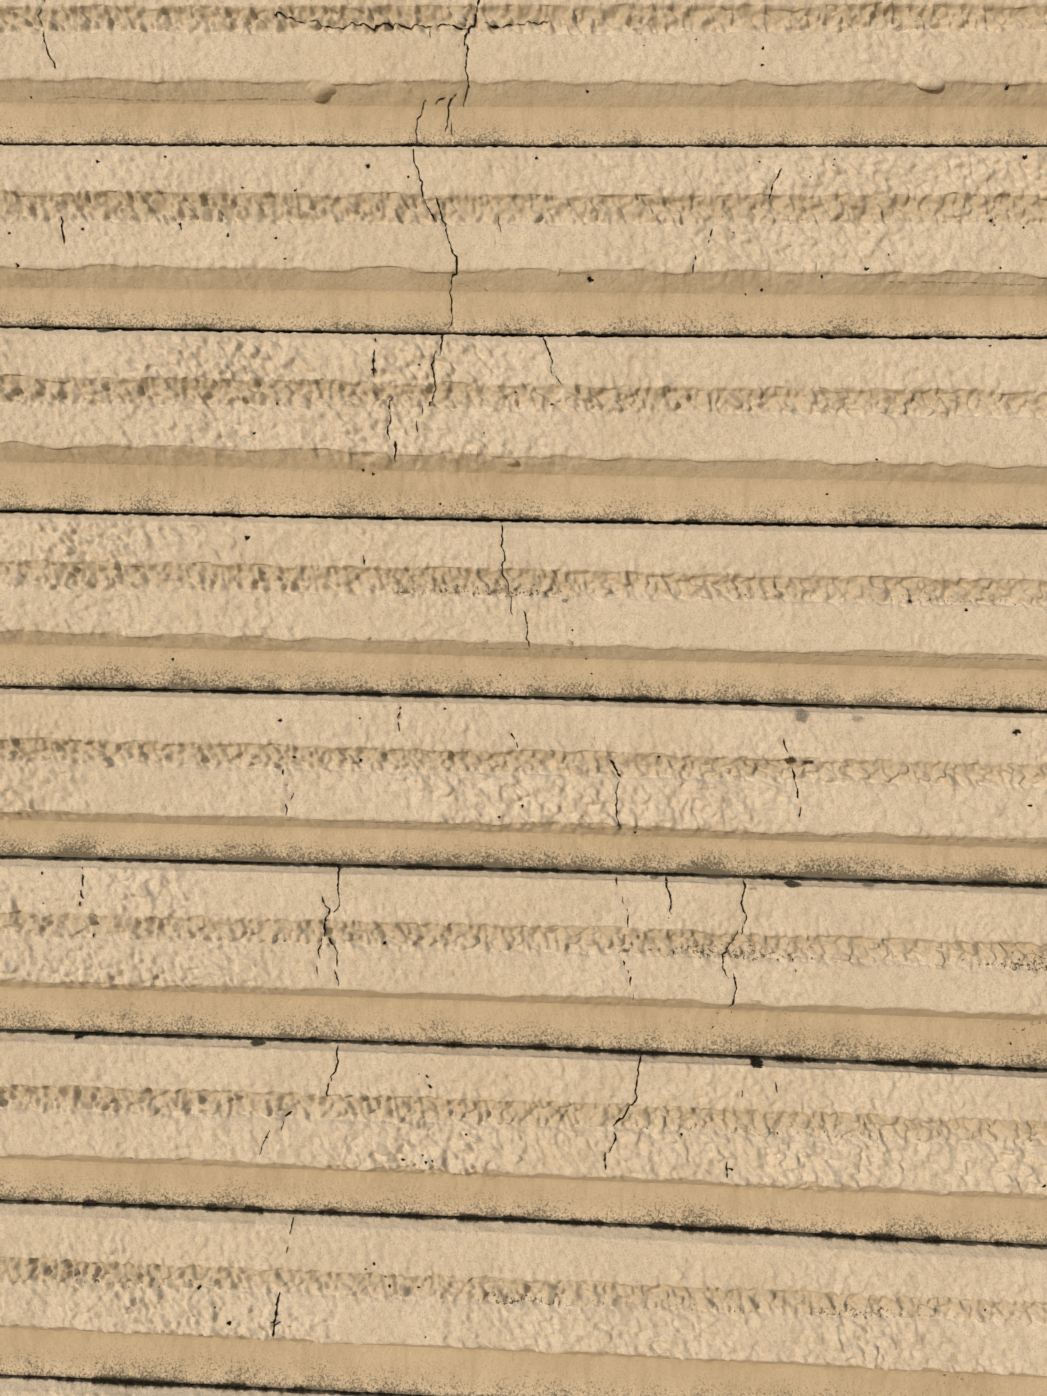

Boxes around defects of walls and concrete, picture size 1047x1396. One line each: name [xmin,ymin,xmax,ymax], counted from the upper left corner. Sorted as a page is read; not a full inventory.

crack [38,0,56,69]
crack [274,0,548,460]
crack [543,337,562,385]
crack [500,521,529,646]
crack [316,865,340,985]
crack [712,879,747,1028]
crack [603,1056,641,1170]